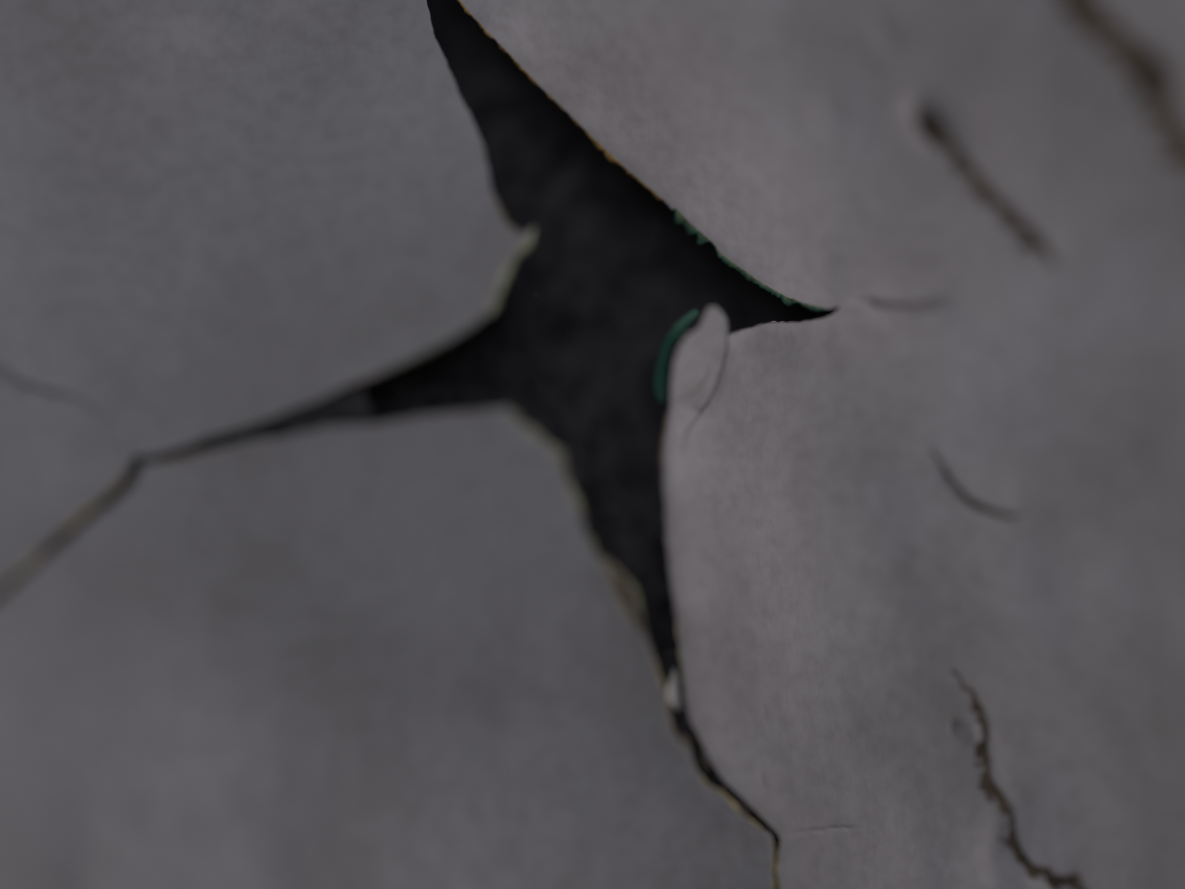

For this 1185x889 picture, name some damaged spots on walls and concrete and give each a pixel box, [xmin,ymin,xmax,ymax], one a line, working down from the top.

crack [0,350,375,622]
peeling [140,0,991,889]
crack [902,416,1057,541]